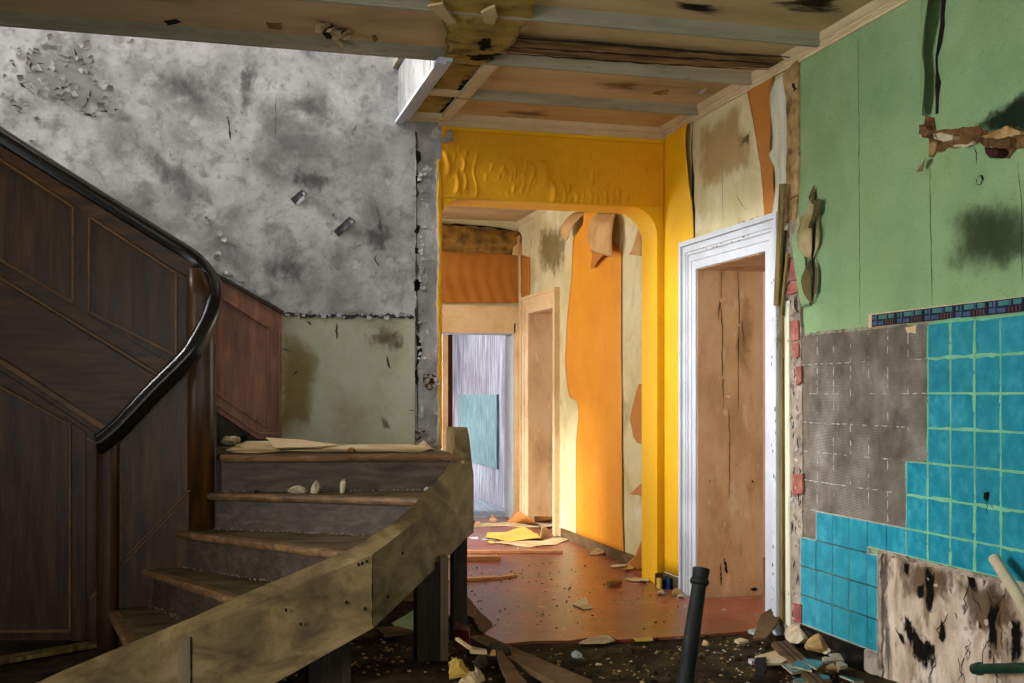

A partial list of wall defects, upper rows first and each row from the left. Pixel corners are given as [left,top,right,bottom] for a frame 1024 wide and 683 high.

peeling [0,33,122,125]
peeling [417,0,535,113]
flaking render [915,115,1024,172]
mould [959,211,1024,263]
leakage [283,348,312,422]
leakage [378,333,401,347]
flaking render [414,160,440,448]
peeling [771,60,932,626]